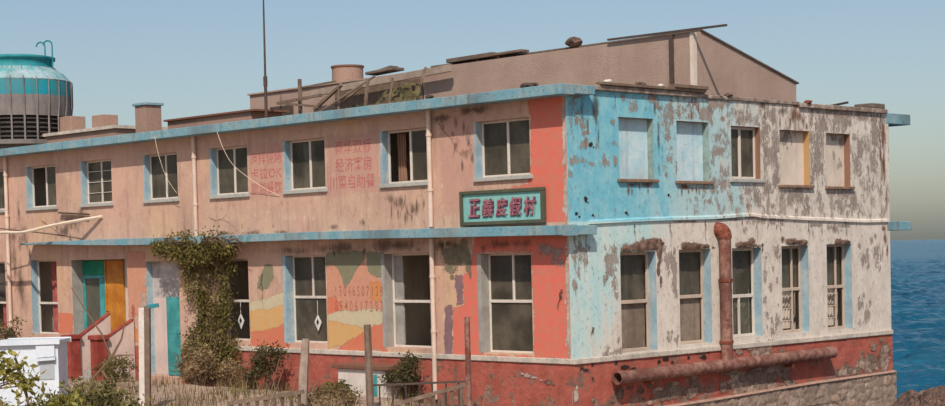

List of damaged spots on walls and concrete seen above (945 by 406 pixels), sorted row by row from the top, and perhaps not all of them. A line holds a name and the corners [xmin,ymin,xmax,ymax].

peeling [561,95,617,222]
peeling [436,239,472,279]
peeling [539,236,590,358]
spalling [591,92,882,406]
spalling [834,338,891,377]